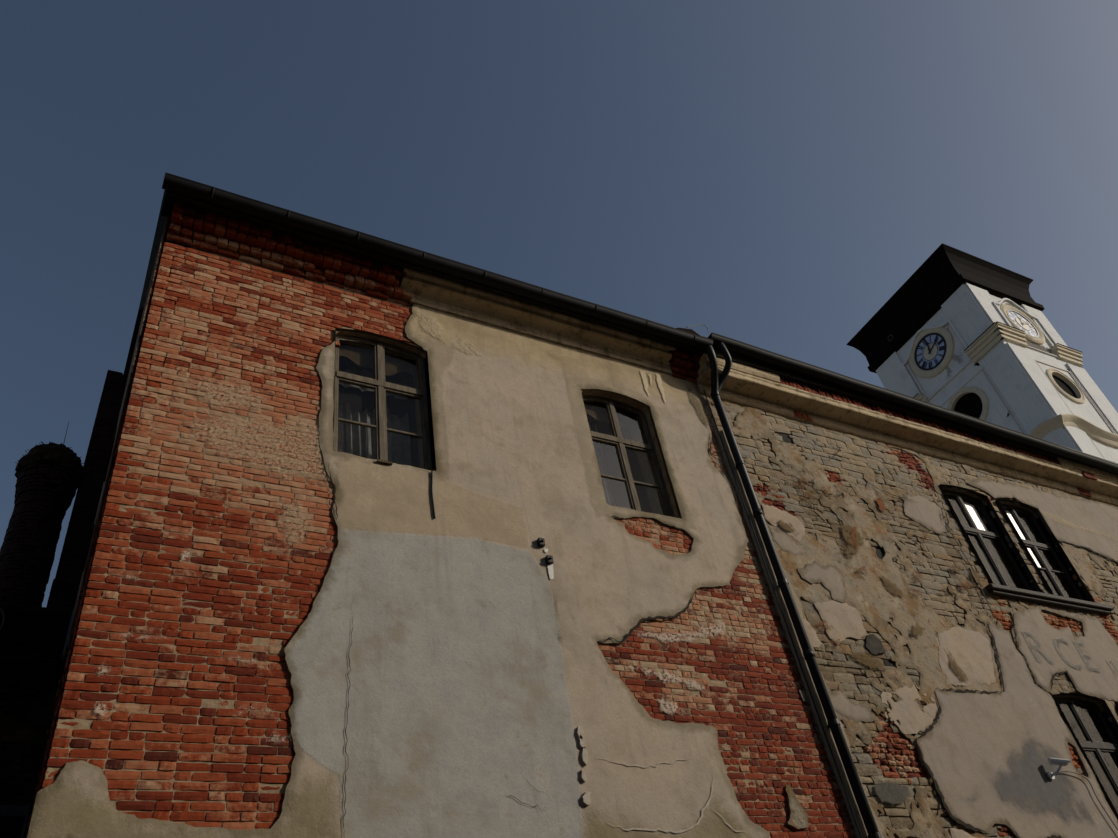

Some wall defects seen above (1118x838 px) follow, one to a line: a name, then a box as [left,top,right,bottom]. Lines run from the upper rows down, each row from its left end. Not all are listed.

peeling [25,217,421,838]
peeling [886,446,951,535]
peeling [597,391,855,838]
peeling [753,483,895,667]
peeling [938,627,996,687]
flaking render [984,576,1016,648]
flaking render [1042,613,1082,637]
flaking render [1071,576,1118,644]
crack [343,602,354,828]
flaking render [829,685,938,784]
flaking render [1068,744,1085,777]
peeling [949,828,977,838]